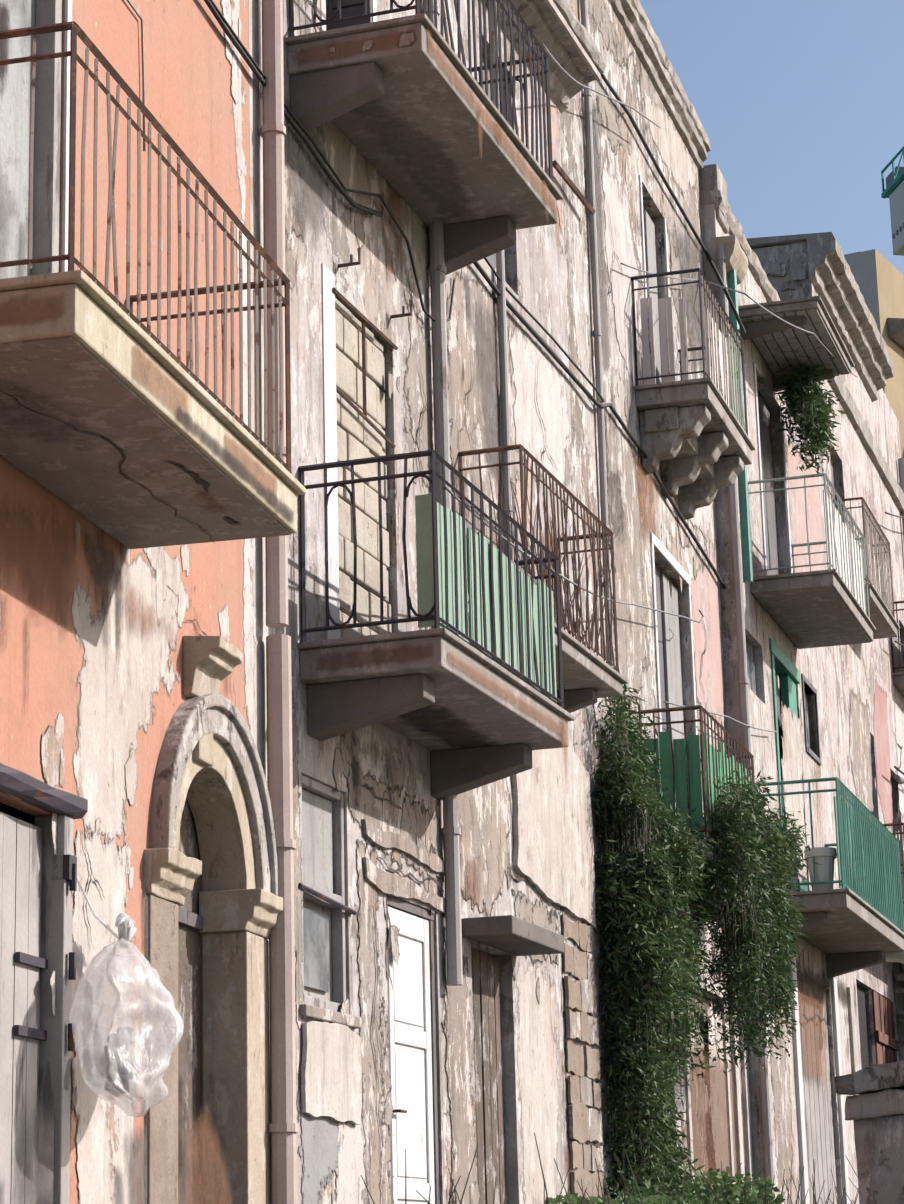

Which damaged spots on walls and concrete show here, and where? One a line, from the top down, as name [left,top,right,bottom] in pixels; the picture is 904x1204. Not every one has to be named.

peeling [221,0,248,432]
crack [0,390,241,543]
peeling [210,539,262,745]
peeling [41,544,196,1204]
peeling [292,707,304,1029]
peeling [296,729,445,1204]
peeling [440,924,482,1204]
crack [510,825,535,887]
spalling [458,777,604,1204]